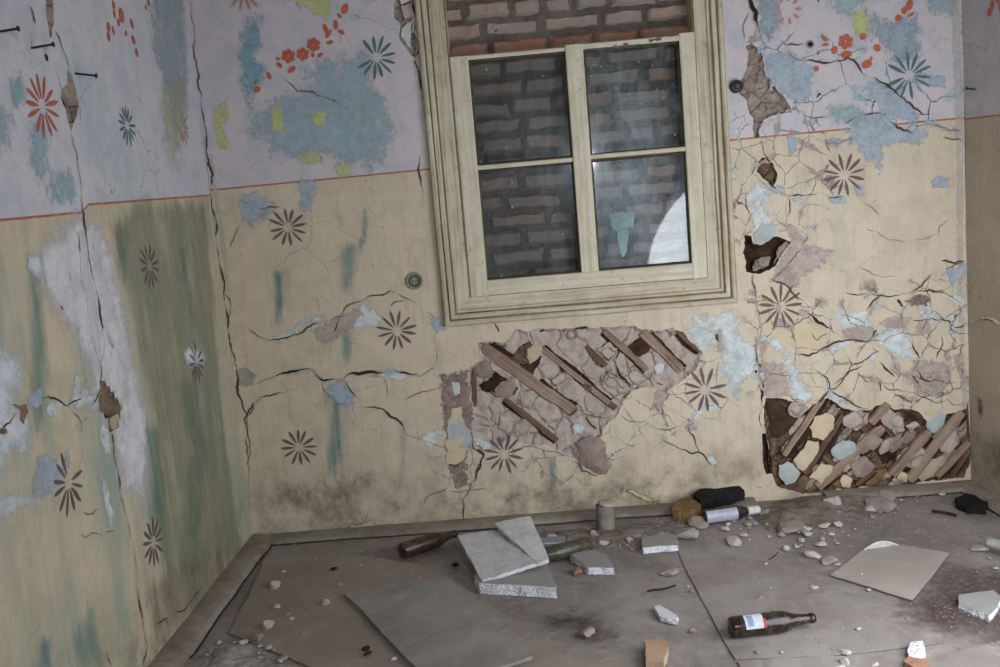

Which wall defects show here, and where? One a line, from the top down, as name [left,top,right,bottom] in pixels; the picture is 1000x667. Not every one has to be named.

spalling [61,69,79,130]
spalling [739,44,815,138]
crack [190,0,1000,518]
peeling [743,157,832,288]
peeling [825,294,938,364]
peeling [0,348,121,517]
spalling [421,311,971,496]
peeling [100,475,114,527]